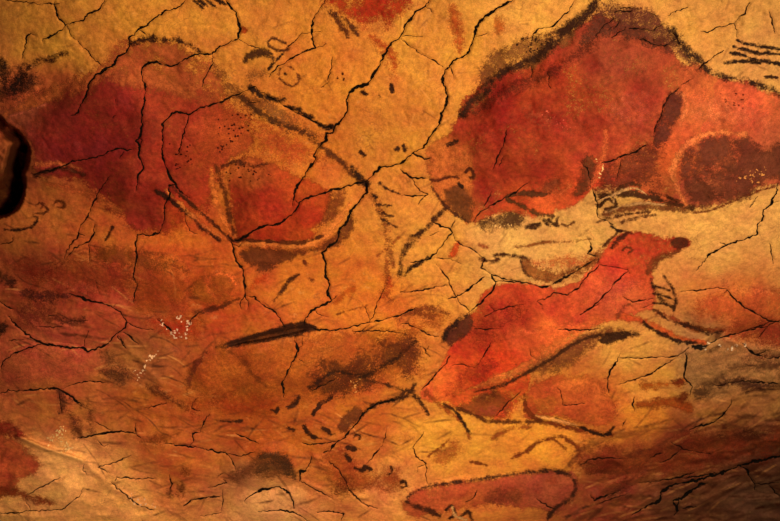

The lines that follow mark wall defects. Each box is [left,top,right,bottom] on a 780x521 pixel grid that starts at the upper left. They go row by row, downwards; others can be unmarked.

crack [596,7,688,47]
crack [701,3,750,33]
crack [581,50,724,225]
crack [0,0,653,397]
crack [682,184,780,359]
crack [1,478,82,514]
crack [1,381,105,414]
crack [77,398,259,516]
crack [244,398,399,521]
crack [413,432,428,481]
crack [604,348,693,428]
crack [631,380,780,516]